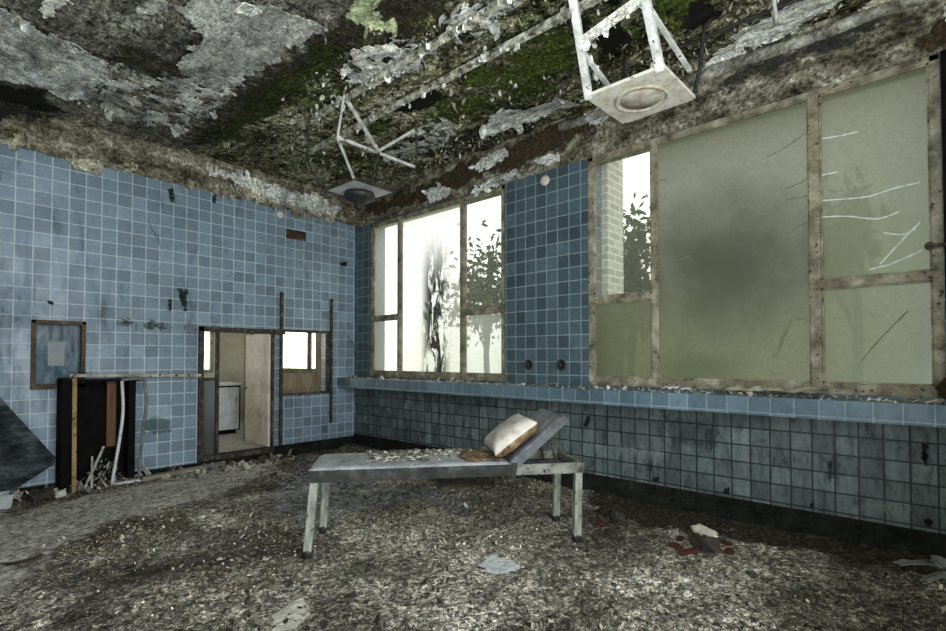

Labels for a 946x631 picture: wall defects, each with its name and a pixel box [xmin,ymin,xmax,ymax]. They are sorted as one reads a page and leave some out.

spalling [914,6,946,53]
leakage [193,0,449,134]
leakage [0,85,67,127]
spalling [209,0,890,222]
flaking render [0,132,30,151]
flaking render [65,155,138,177]
rust [935,378,946,399]